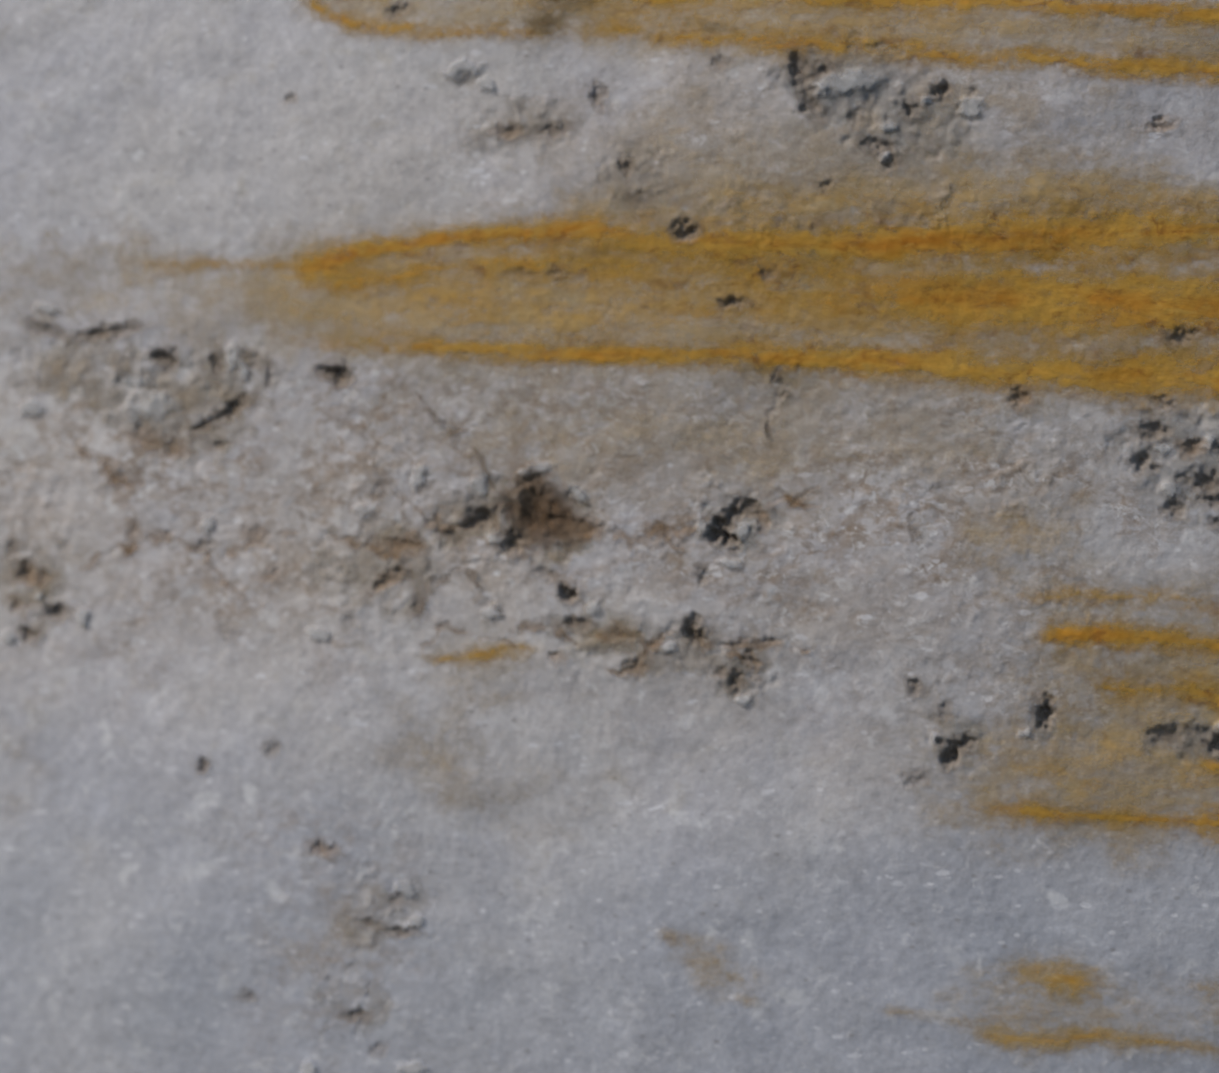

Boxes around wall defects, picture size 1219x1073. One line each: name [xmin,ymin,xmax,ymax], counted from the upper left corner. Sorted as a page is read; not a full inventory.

rust [311,0,1219,84]
spalling [790,54,878,112]
spalling [869,83,951,161]
rust [269,169,1219,399]
spalling [21,325,247,443]
spalling [1137,421,1219,516]
spalling [455,464,586,563]
spalling [696,500,763,567]
spalling [560,587,577,602]
spalling [685,614,704,659]
rust [977,623,1219,836]
rust [984,1029,1189,1049]